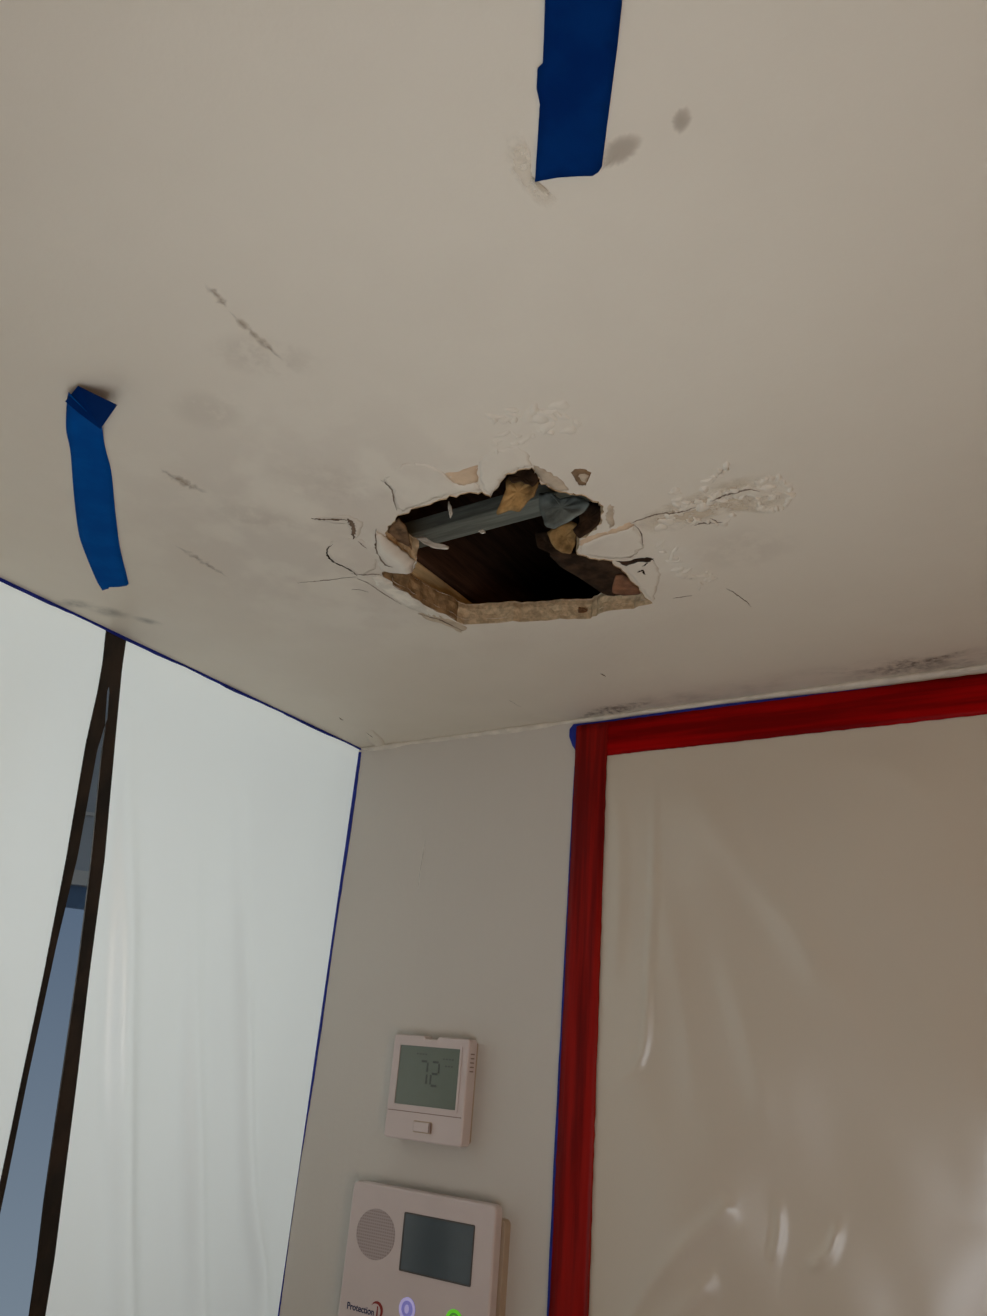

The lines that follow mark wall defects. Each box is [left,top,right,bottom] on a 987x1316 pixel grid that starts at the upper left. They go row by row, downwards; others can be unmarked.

crack [300,480,462,631]
spalling [313,447,661,632]